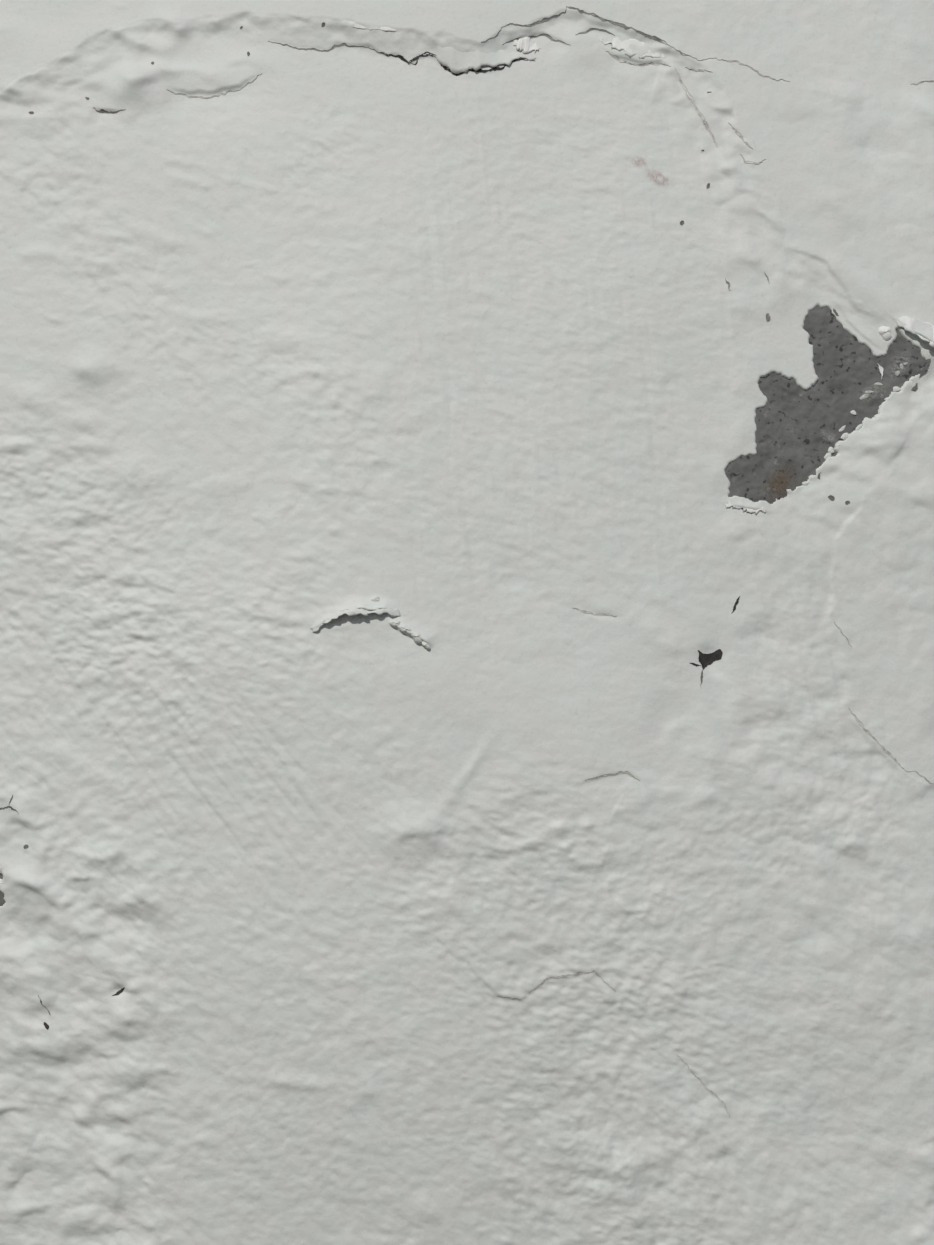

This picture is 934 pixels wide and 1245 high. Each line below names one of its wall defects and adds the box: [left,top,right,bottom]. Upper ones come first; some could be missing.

crack [368,6,785,81]
peeling [725,305,934,515]
peeling [306,596,431,658]
peeling [690,649,723,686]